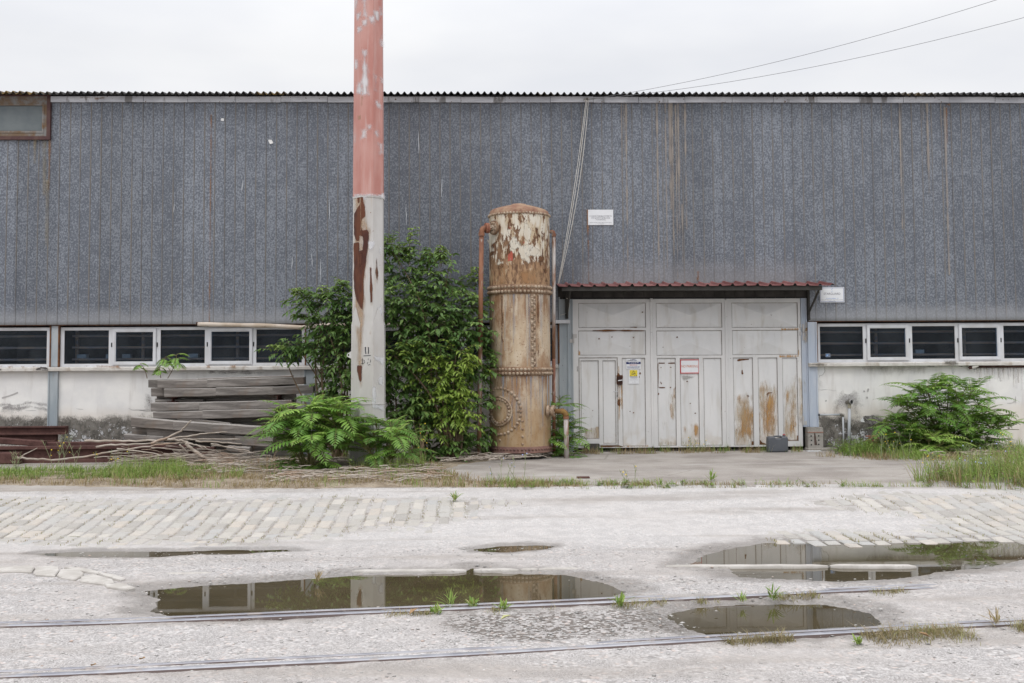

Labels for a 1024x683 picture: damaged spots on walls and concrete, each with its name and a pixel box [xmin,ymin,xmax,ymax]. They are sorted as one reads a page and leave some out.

peeling [355,51,368,94]
corrosion [353,197,378,382]
leakage [0,402,132,442]
corrosion [736,389,802,445]